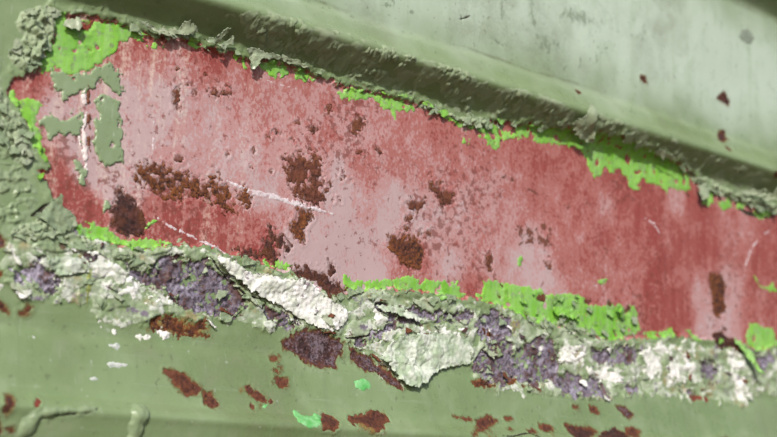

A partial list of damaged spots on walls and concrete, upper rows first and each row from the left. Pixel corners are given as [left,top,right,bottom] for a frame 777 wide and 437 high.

rust [108,186,150,239]
rust [134,156,253,215]
rust [231,137,347,267]
peeling [0,9,777,352]
rust [386,173,457,270]
rust [291,257,348,299]
rust [269,325,403,391]
peeling [344,285,481,391]
peeling [471,304,646,402]
peeling [637,337,777,409]
rust [708,273,744,355]
rust [321,409,390,434]